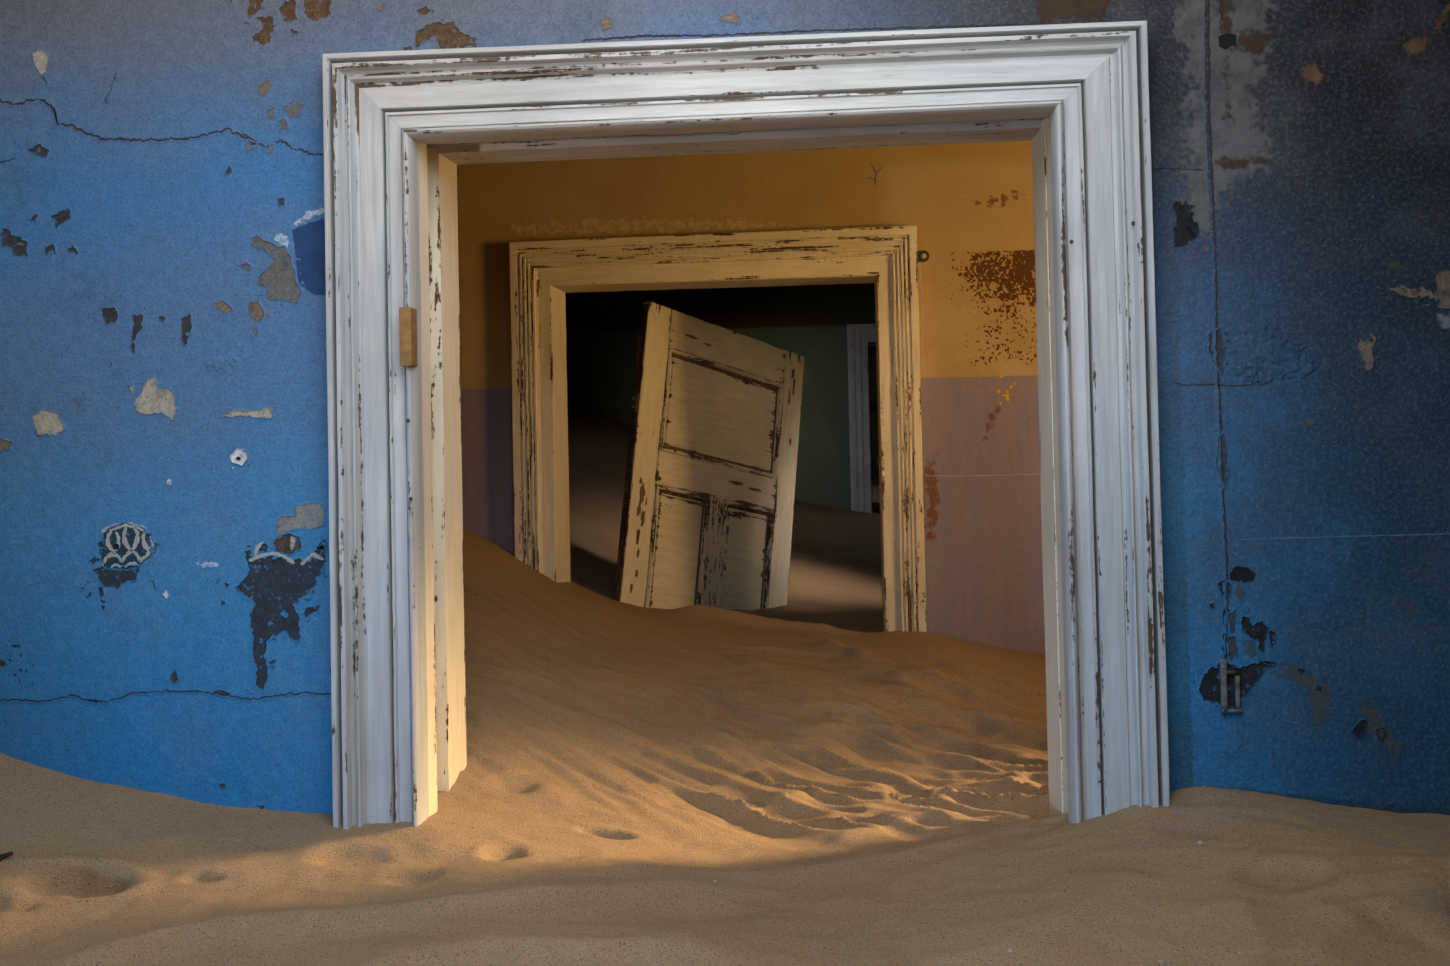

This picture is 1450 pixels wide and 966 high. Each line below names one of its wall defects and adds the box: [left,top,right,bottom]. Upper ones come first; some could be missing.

peeling [239,0,335,51]
peeling [398,5,482,50]
crack [0,57,324,159]
peeling [100,229,305,425]
peeling [1373,260,1450,317]
peeling [27,404,71,442]
peeling [80,521,160,610]
peeling [212,500,330,698]
spalling [1192,565,1305,716]
crack [0,668,331,706]